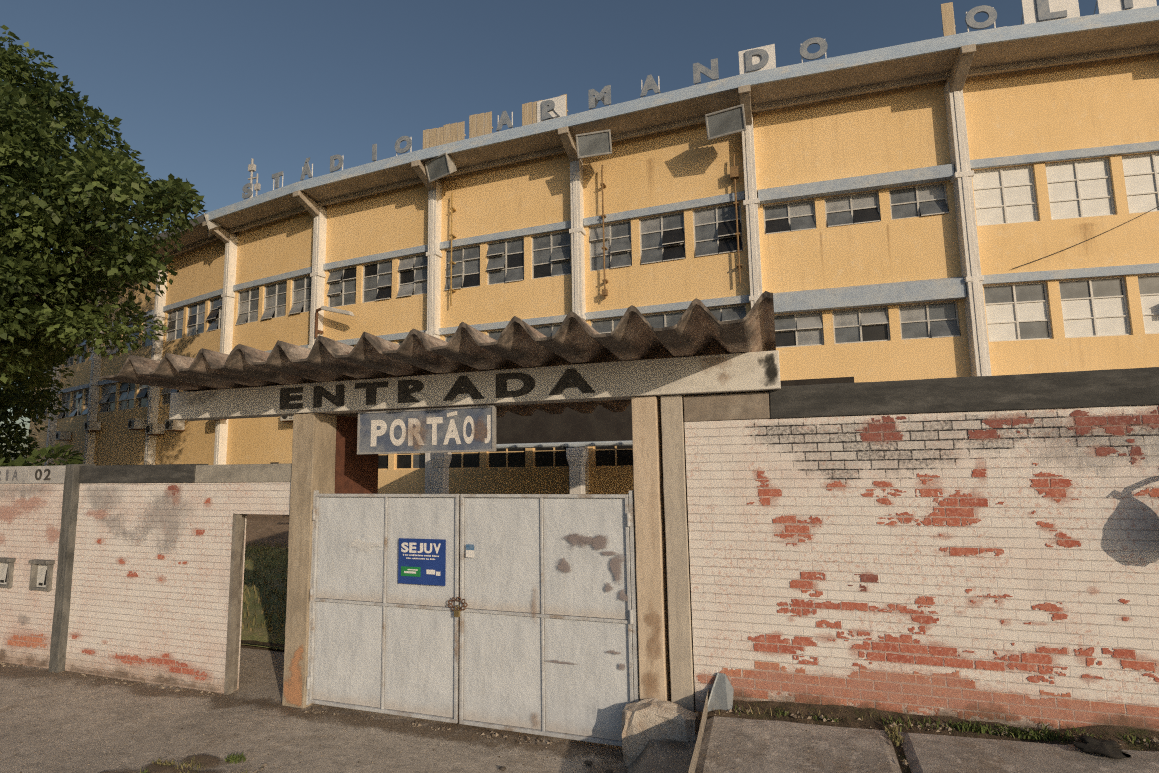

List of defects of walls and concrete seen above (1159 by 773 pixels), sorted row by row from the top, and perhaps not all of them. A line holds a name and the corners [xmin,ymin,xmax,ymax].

peeling [856,415,906,443]
peeling [968,416,1034,439]
peeling [1067,406,1159,464]
peeling [747,470,782,505]
peeling [971,462,987,477]
peeling [1030,463,1079,502]
peeling [773,515,822,546]
peeling [862,473,1004,556]
peeling [1032,510,1081,548]
peeling [557,533,628,601]
peeling [115,653,208,681]
peeling [697,571,1159,731]